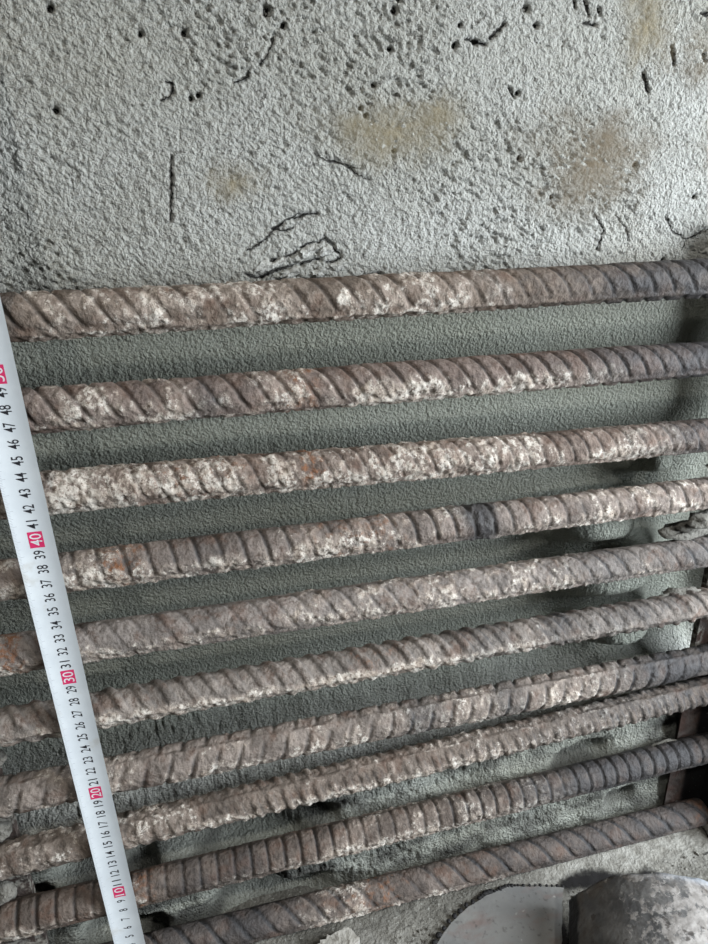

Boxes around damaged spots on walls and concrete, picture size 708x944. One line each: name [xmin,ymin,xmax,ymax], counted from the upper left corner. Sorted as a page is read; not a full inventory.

crack [168,154,176,221]
crack [246,213,299,251]
crack [593,212,629,250]
crack [665,216,708,251]
flaking render [247,239,344,281]